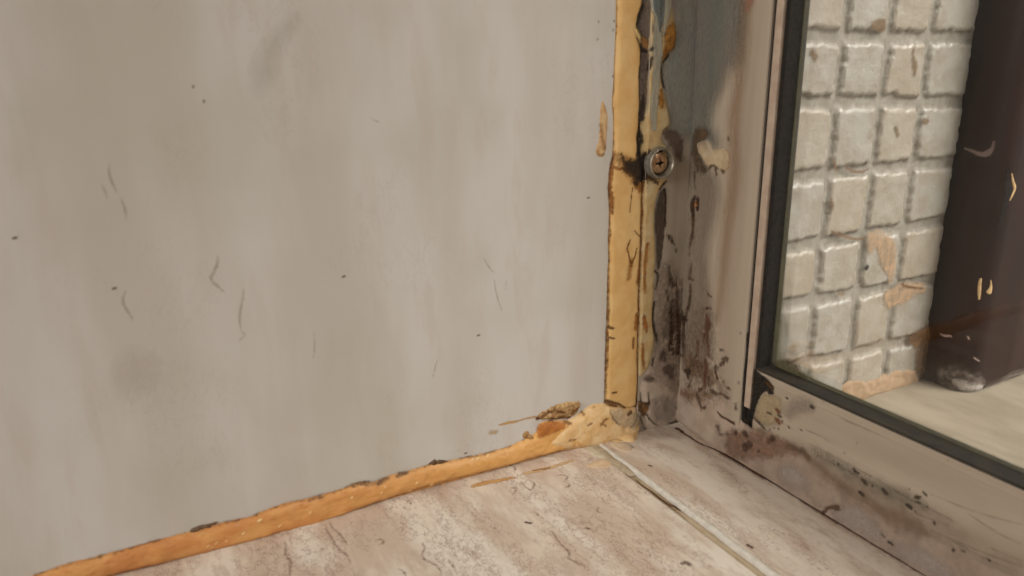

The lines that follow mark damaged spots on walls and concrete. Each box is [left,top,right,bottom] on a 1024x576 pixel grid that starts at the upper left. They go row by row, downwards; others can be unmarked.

peeling [664,0,743,176]
water stain [630,215,818,460]
peeling [832,230,926,308]